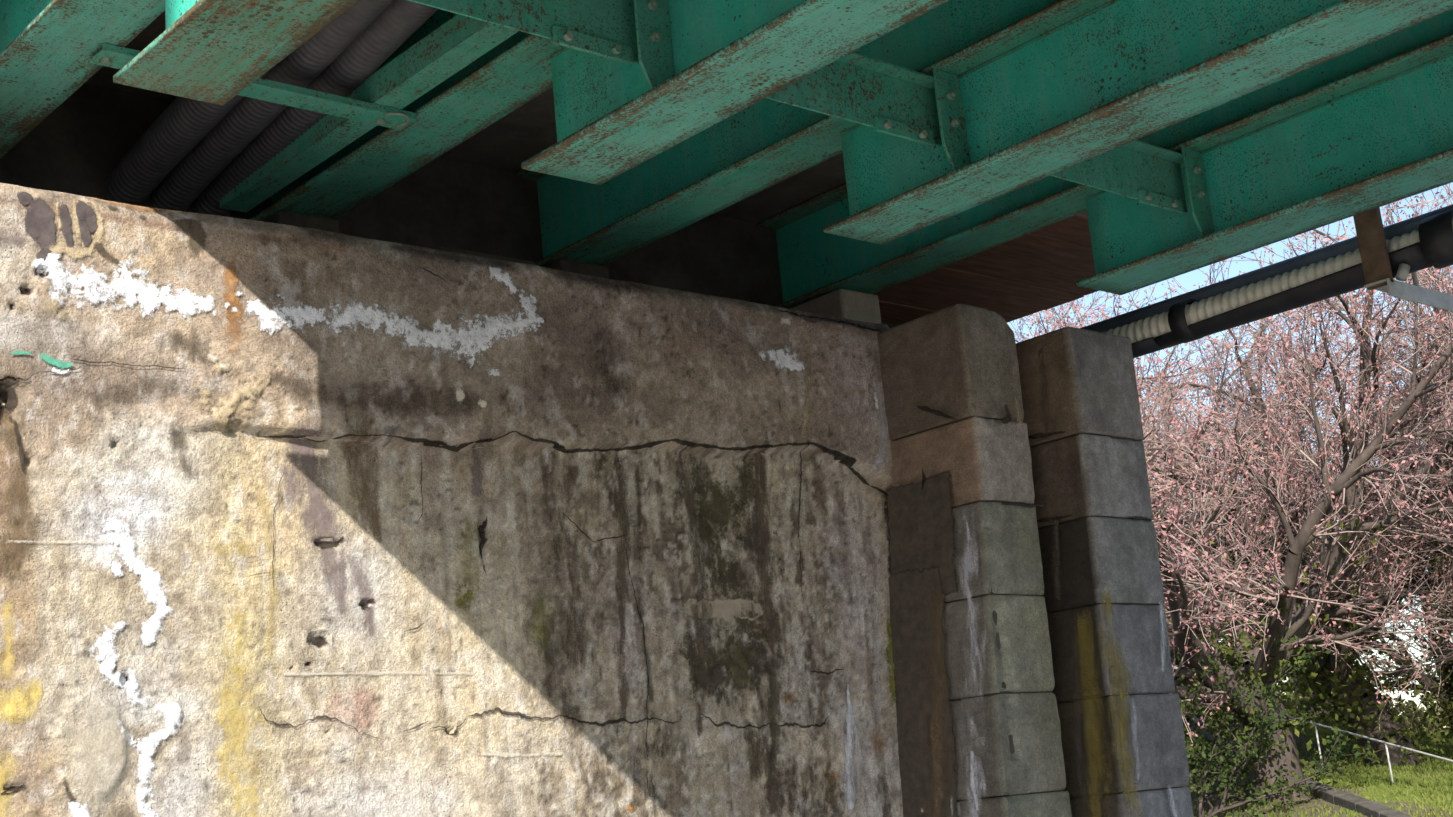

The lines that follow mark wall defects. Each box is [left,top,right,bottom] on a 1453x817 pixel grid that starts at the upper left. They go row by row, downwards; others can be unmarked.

damp [31,252,216,363]
damp [269,373,487,635]
damp [246,266,544,377]
crack [259,513,829,788]
damp [538,512,596,733]
crack [250,431,888,596]
damp [593,455,671,817]
damp [678,447,714,736]
damp [744,442,862,817]
damp [877,471,986,817]
crack [917,406,957,420]